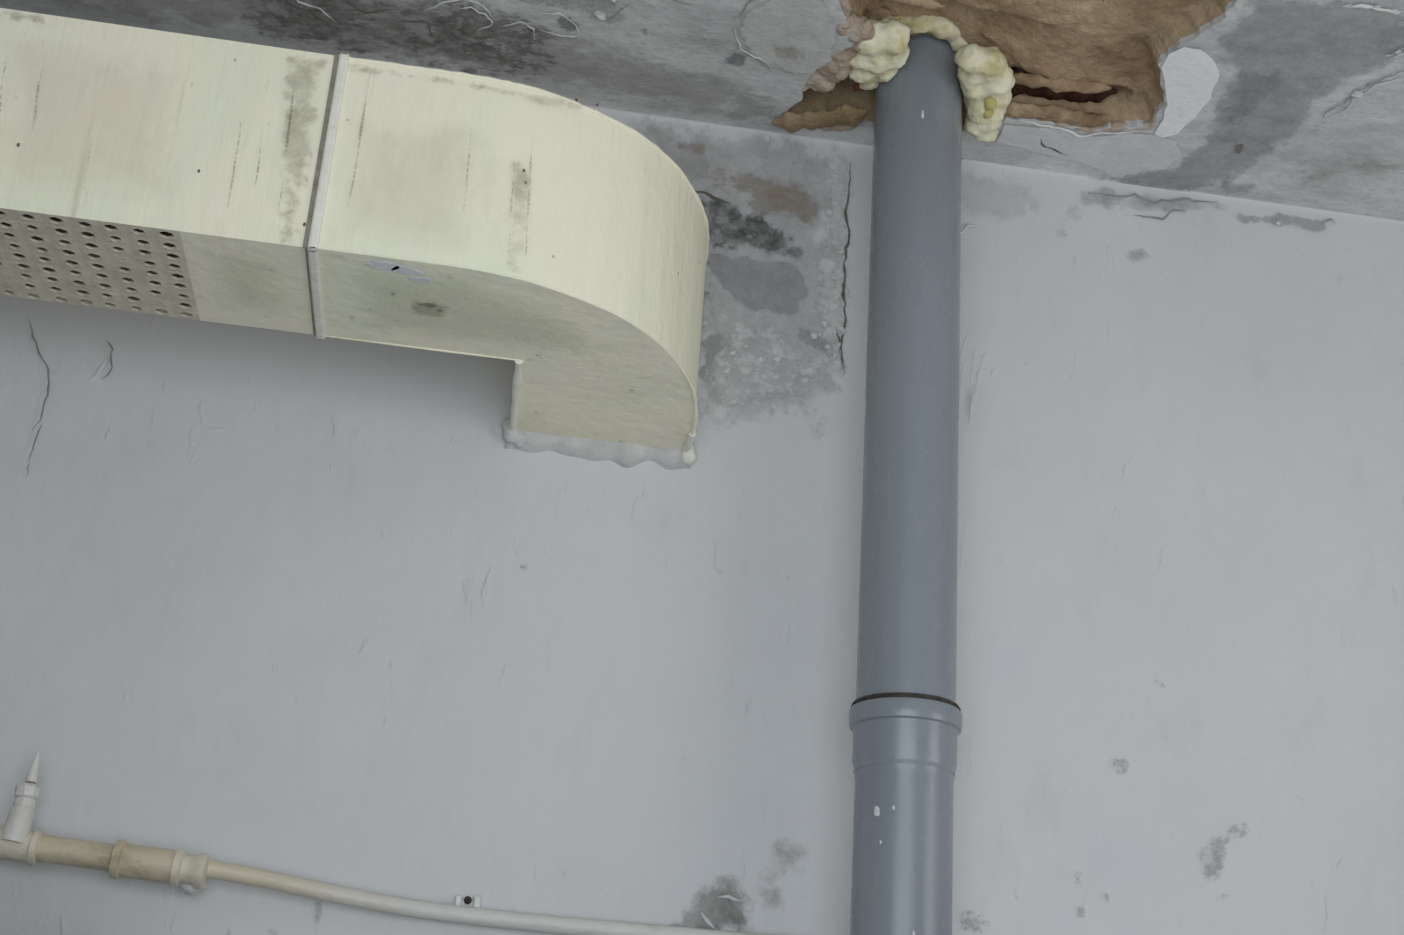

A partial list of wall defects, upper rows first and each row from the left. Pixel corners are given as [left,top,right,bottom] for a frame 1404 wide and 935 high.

peeling [523,0,631,32]
spalling [891,0,945,9]
water stain [57,0,769,119]
peeling [726,54,746,66]
spalling [802,0,875,92]
spalling [1013,72,1112,94]
water stain [1085,0,1404,220]
water stain [696,191,801,257]
water stain [1239,213,1335,231]
crack [22,319,50,477]
water stain [693,886,745,929]